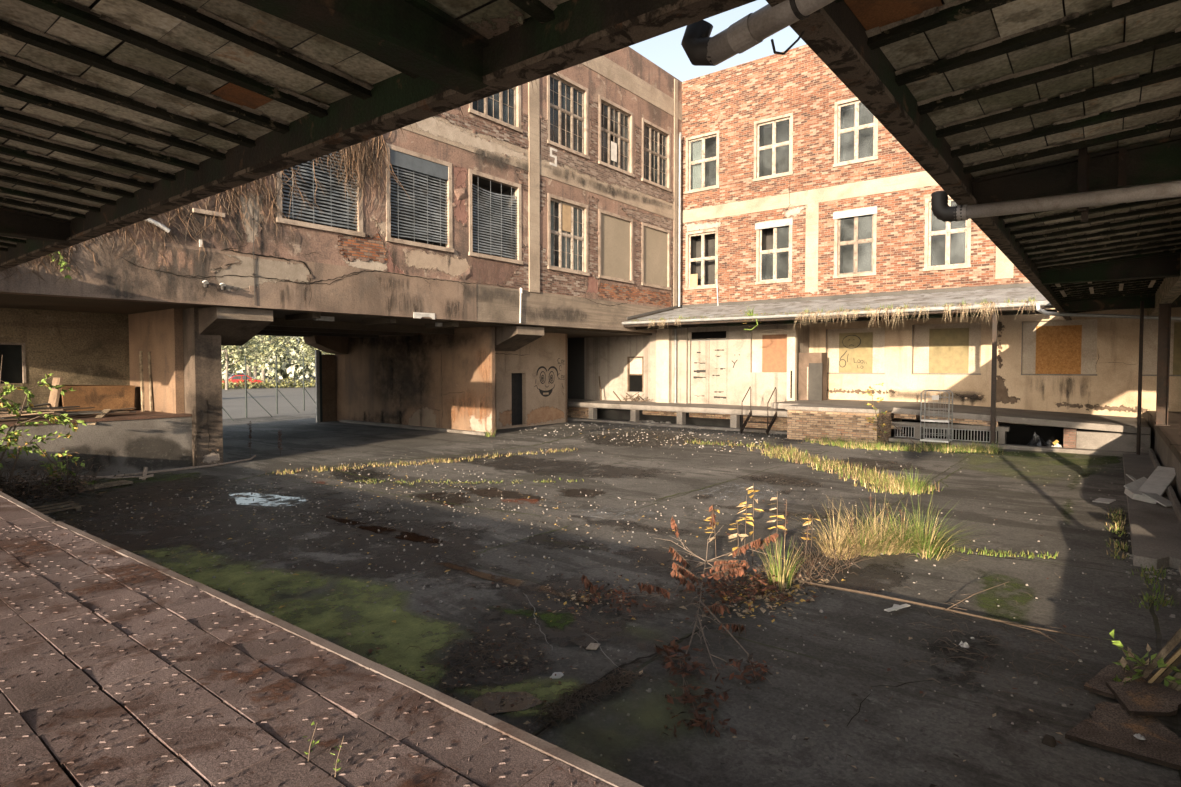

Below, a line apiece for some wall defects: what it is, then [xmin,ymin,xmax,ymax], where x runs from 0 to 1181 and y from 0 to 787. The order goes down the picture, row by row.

crack [115,215,518,303]
flaking render [337,216,472,279]
flaking render [958,321,1020,404]